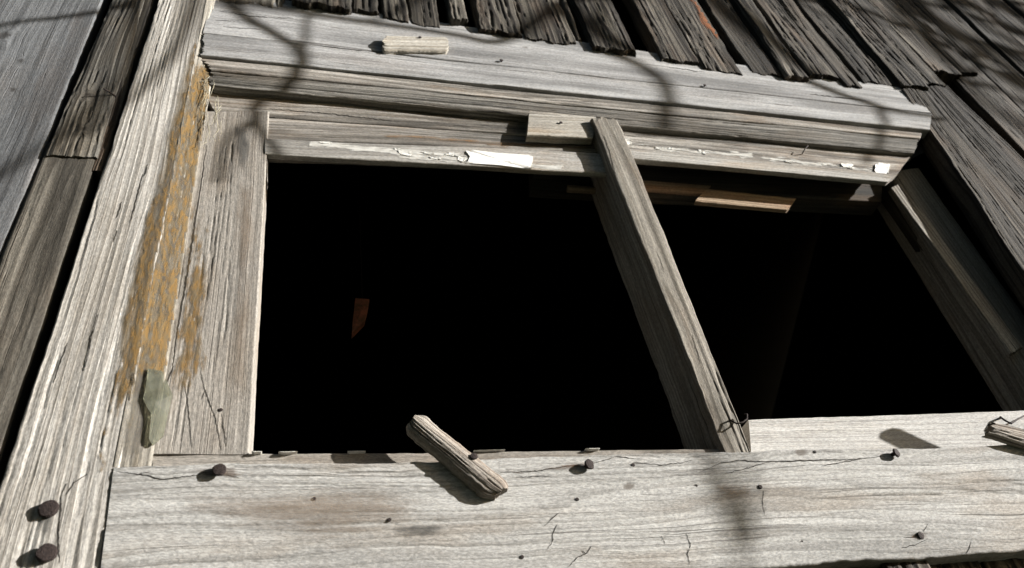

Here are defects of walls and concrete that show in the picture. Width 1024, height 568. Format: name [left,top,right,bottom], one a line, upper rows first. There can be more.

peeling [309,141,563,171]
peeling [625,139,890,174]
crack [168,147,227,449]
crack [119,471,204,480]
crack [595,456,880,474]